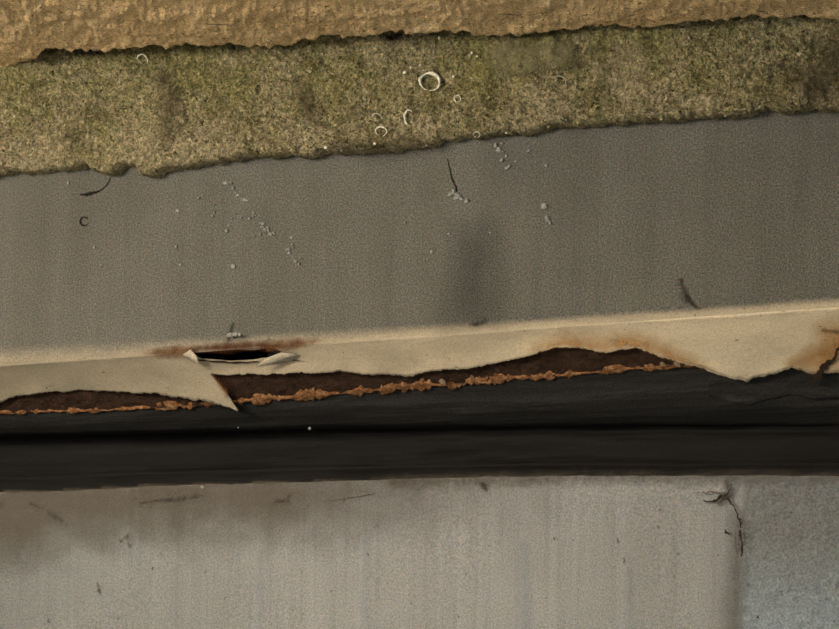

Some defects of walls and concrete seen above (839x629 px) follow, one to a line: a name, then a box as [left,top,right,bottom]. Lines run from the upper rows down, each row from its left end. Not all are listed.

peeling [0,390,216,415]
peeling [212,347,694,405]
corrosion [547,338,690,362]
peeling [709,367,839,405]
crack [799,331,839,384]
crack [695,481,745,557]